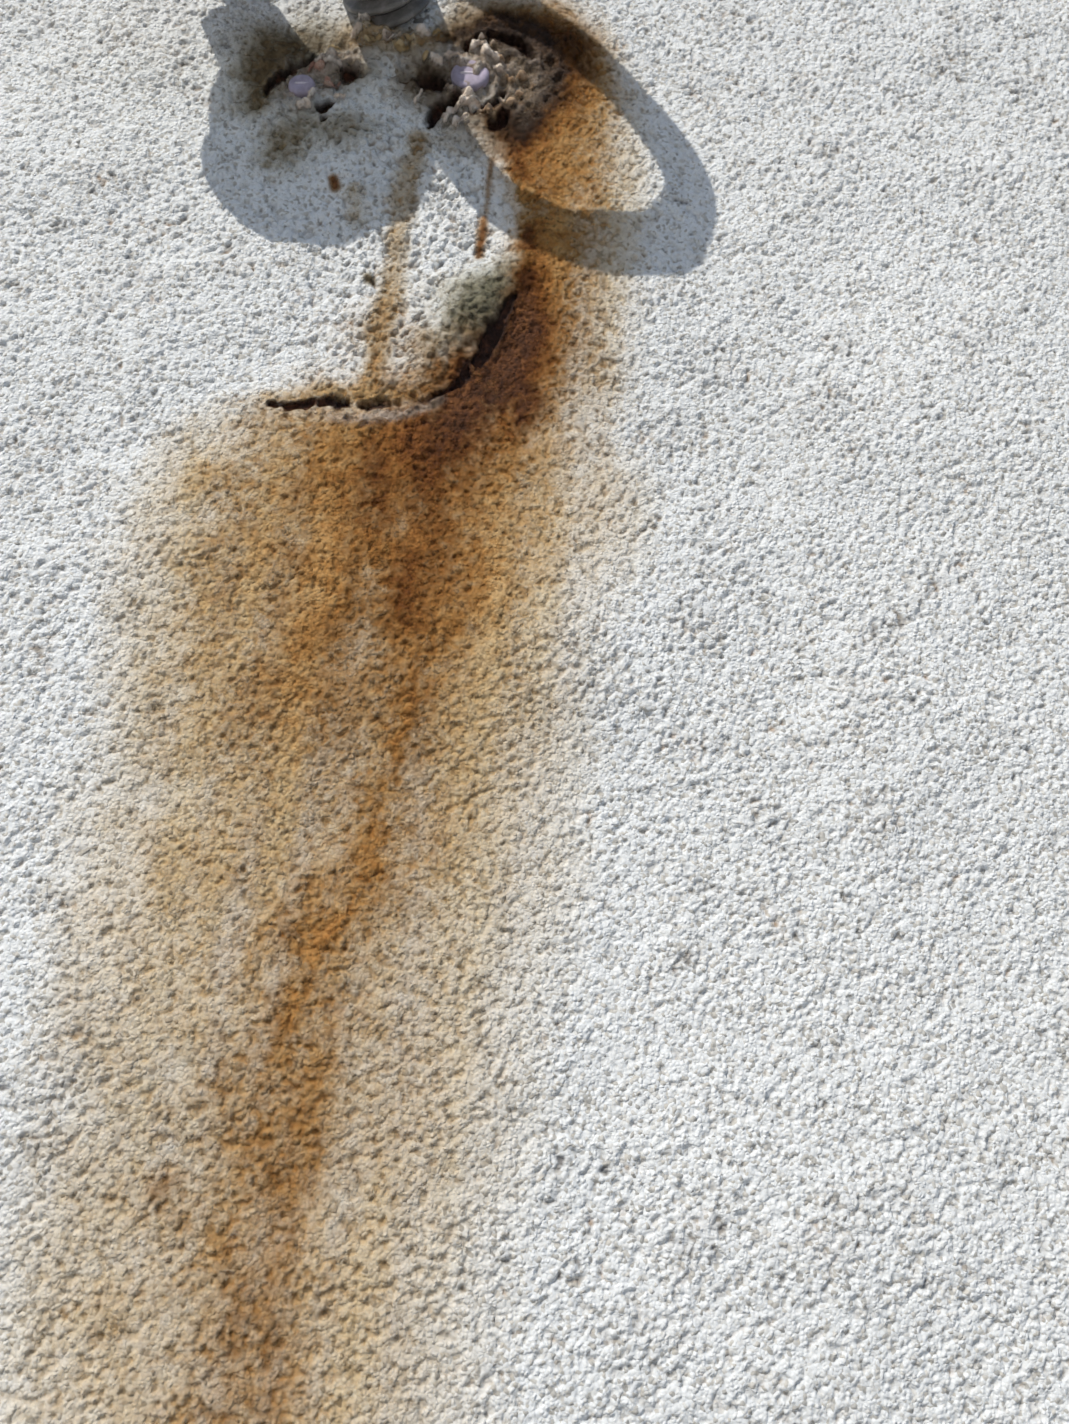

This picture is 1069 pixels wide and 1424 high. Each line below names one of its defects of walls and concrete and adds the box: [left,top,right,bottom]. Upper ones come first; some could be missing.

spalling [265,12,535,131]
crack [268,294,517,419]
rust [151,9,615,1424]